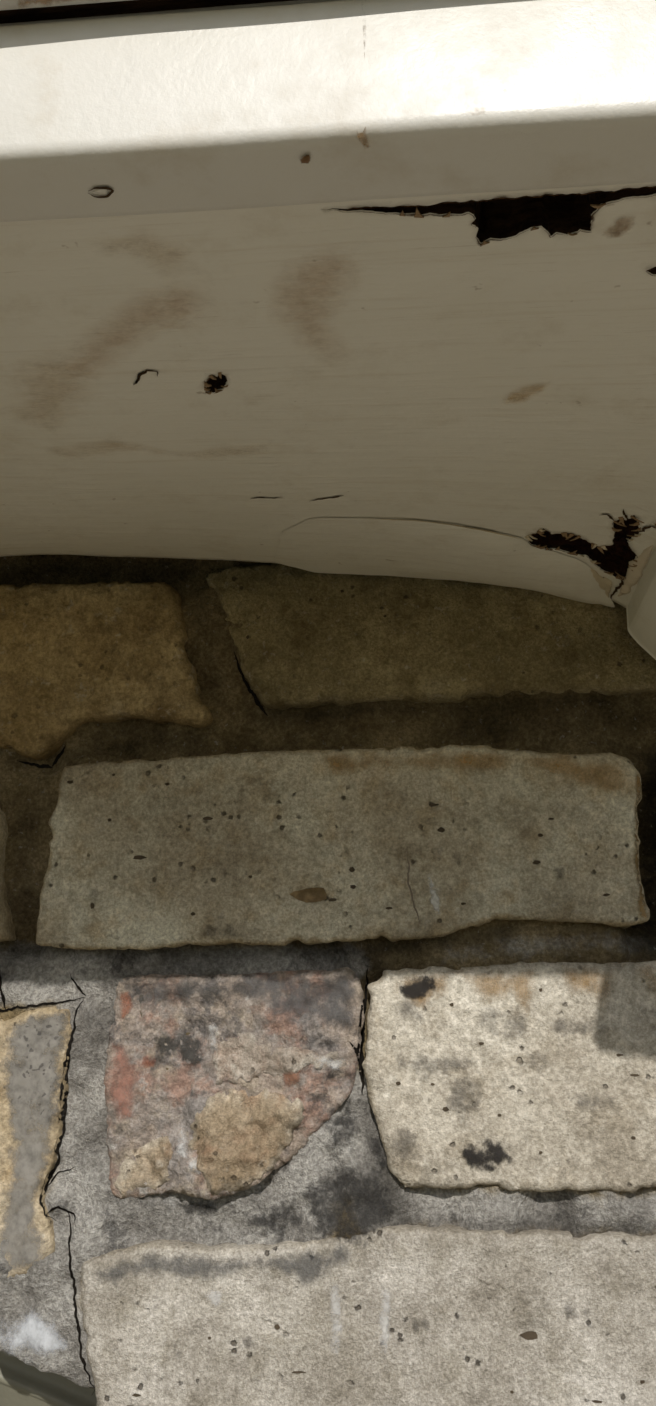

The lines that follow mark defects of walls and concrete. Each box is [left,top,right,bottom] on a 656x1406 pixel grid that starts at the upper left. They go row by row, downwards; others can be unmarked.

spalling [398,186,654,246]
spalling [529,515,656,596]
crack [0,974,95,1393]